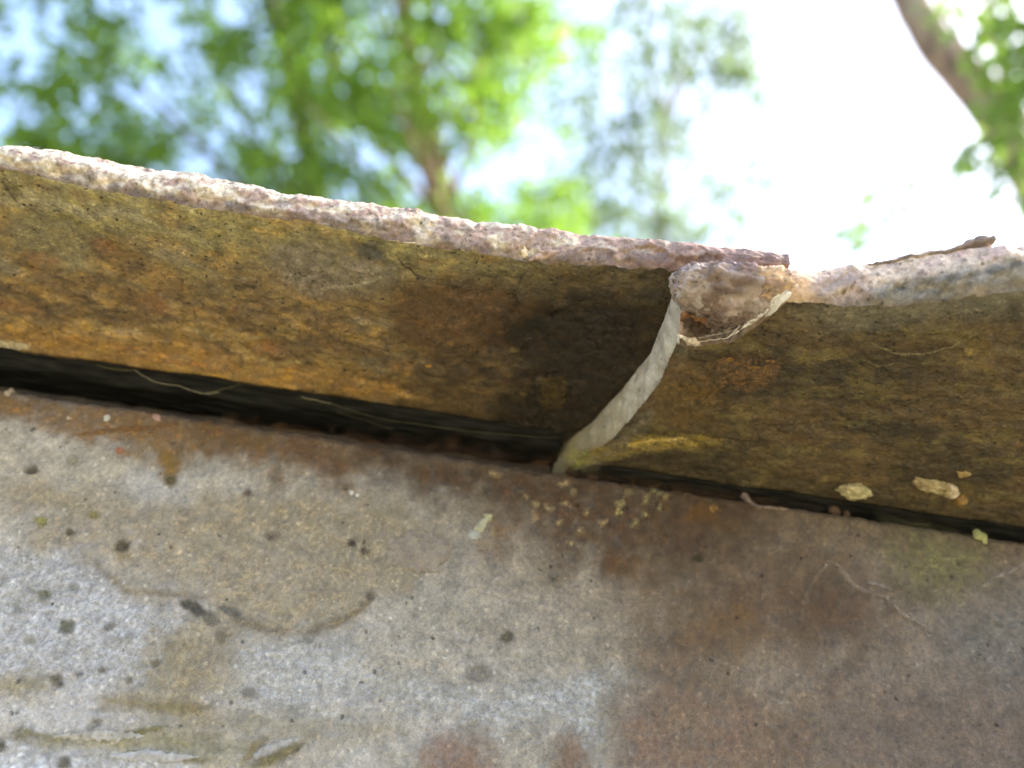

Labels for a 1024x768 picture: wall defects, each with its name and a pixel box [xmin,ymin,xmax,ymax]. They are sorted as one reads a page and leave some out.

spalling [0,146,1024,347]
leakage [492,295,658,439]
leakage [388,457,754,573]